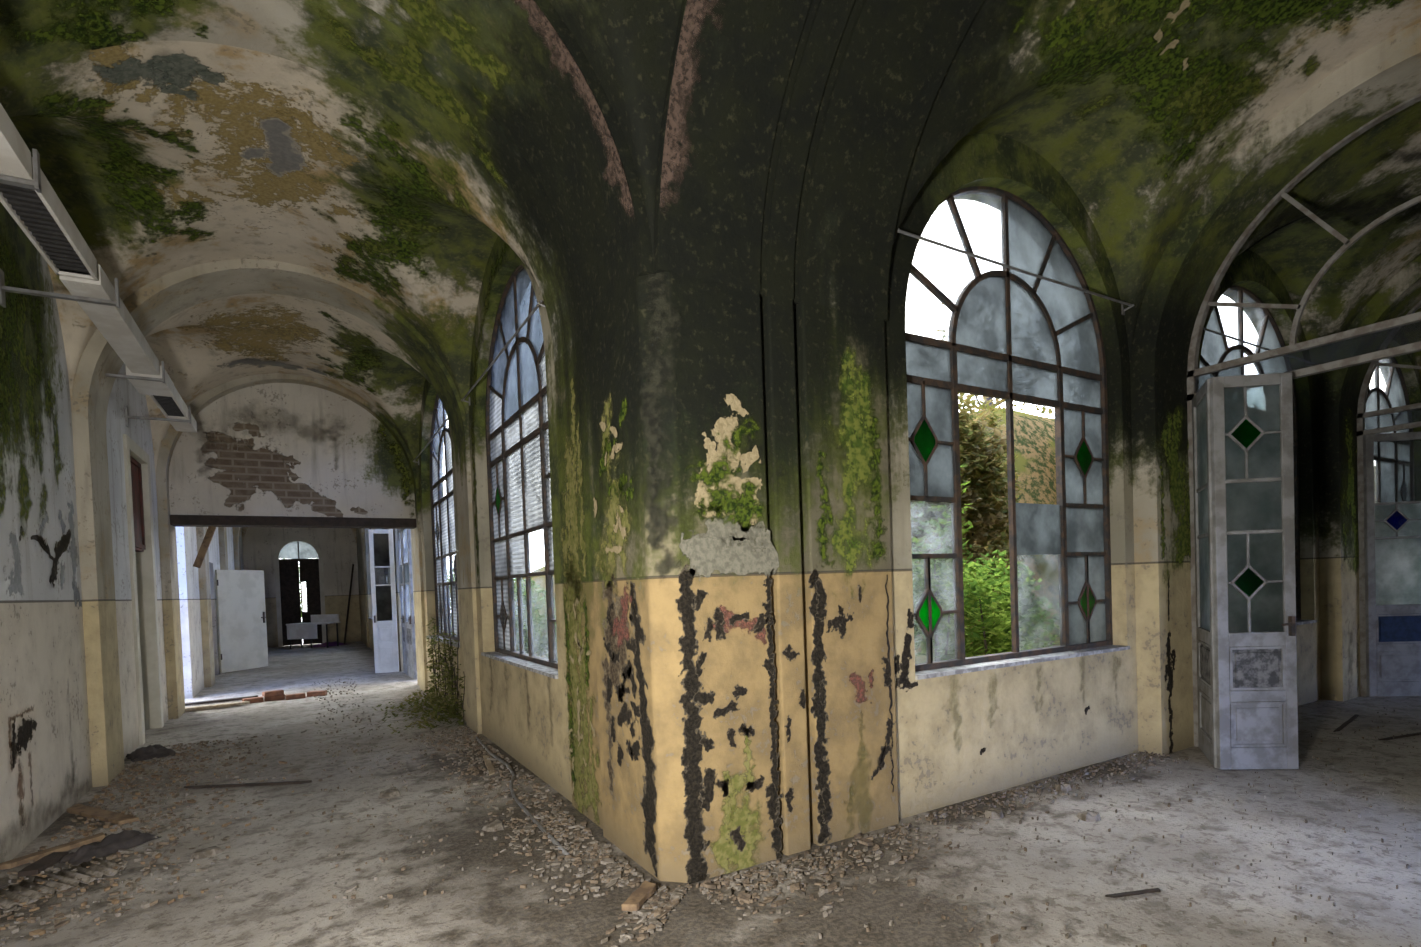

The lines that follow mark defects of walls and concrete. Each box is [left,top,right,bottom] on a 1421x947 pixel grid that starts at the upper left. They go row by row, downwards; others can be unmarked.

leakage [88,51,225,101]
peeling [85,45,368,254]
peeling [177,304,352,376]
flaking render [201,422,368,517]
flaking render [694,393,763,541]
spalling [8,706,37,770]
leakage [563,597,590,786]
flaking render [568,506,658,877]
peeling [675,564,862,884]
peeling [871,718,896,780]